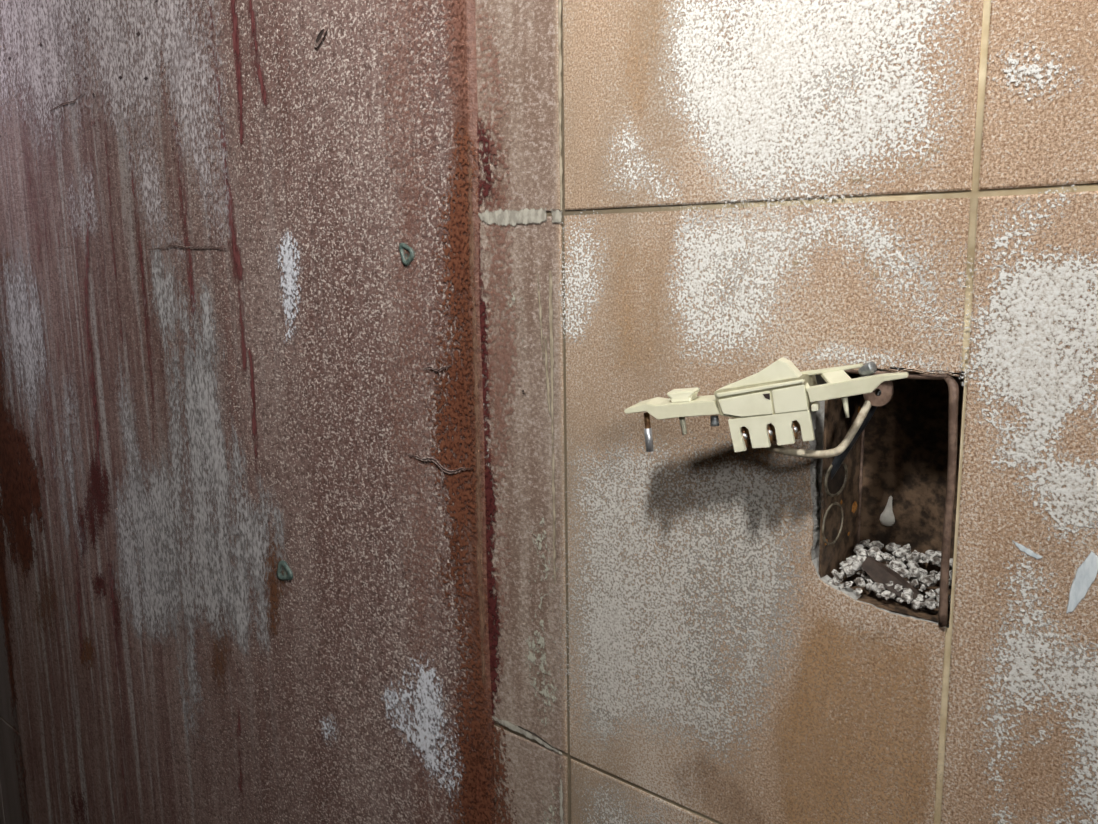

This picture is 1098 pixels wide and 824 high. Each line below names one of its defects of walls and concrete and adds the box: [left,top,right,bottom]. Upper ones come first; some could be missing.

rust [0,335,45,824]
rust [76,450,110,564]
damp [0,0,284,733]
rust [262,537,284,638]
damp [319,714,337,744]
damp [381,655,464,801]
rust [418,0,520,824]
damp [558,211,609,342]
damp [600,0,1098,554]
damp [976,554,1098,824]